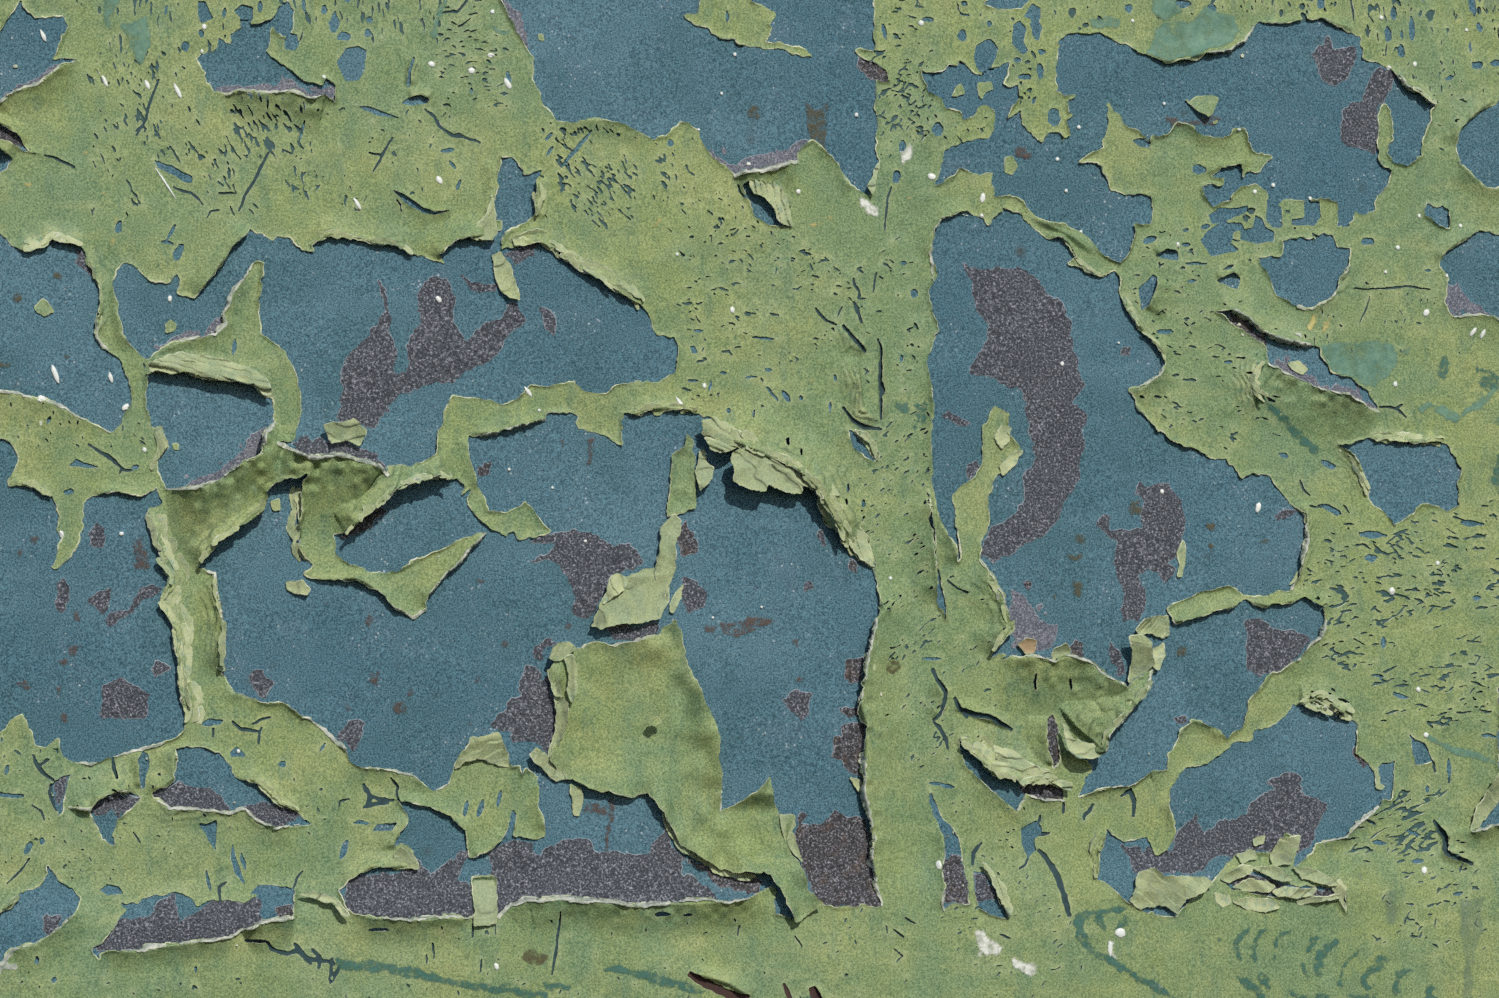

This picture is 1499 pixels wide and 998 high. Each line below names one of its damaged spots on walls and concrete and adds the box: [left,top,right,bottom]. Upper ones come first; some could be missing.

peeling [1468,0,1499,69]
peeling [1448,100,1499,197]
peeling [1424,205,1499,331]
peeling [0,0,906,974]
peeling [910,0,1484,918]
peeling [1467,731,1499,847]